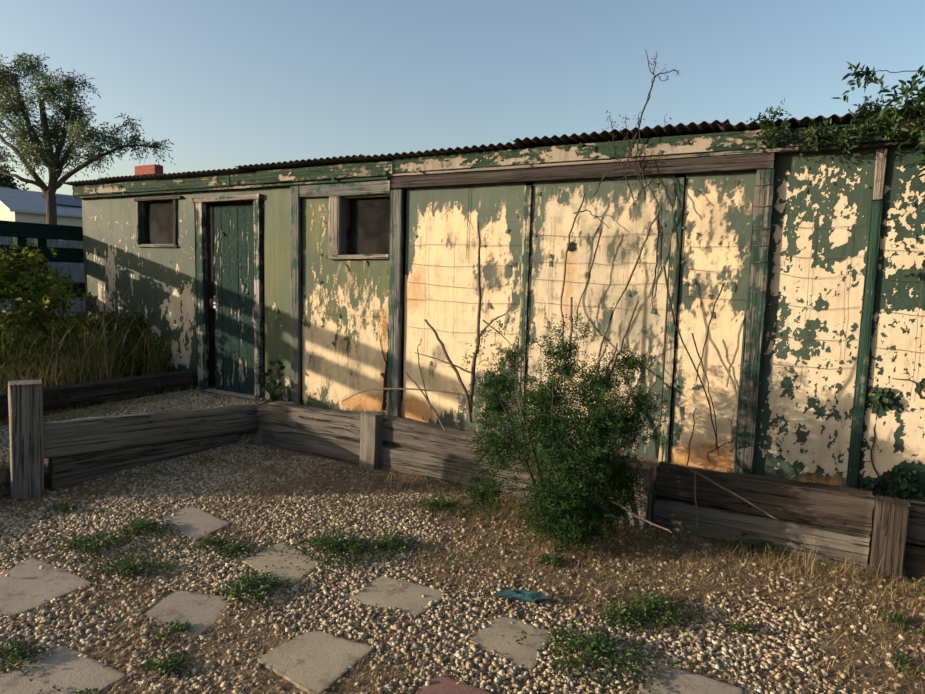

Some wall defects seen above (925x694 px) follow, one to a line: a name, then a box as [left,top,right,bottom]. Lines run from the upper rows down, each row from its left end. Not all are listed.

peeling [89,184,126,195]
peeling [400,142,609,173]
peeling [626,136,770,157]
peeling [86,206,196,369]
peeling [214,220,249,332]
peeling [265,370,290,401]
peeling [302,248,389,415]
peeling [403,181,672,450]
rust [676,442,729,472]
peeling [669,179,752,470]
peeling [758,159,869,479]
peeling [860,165,925,482]